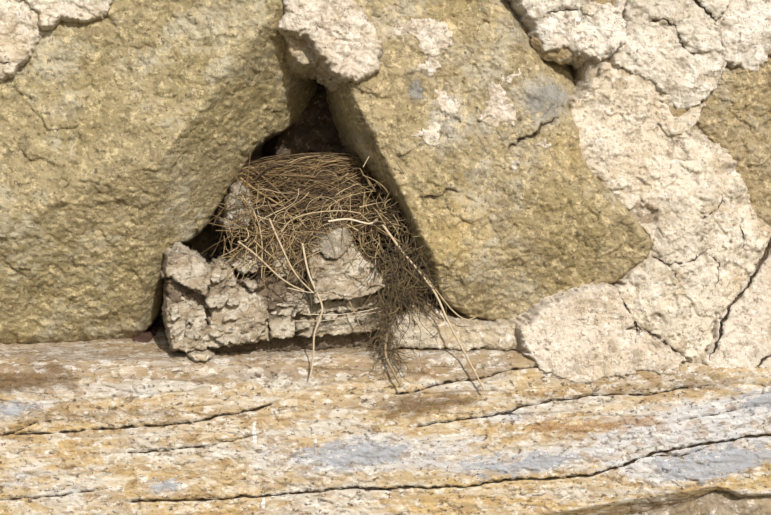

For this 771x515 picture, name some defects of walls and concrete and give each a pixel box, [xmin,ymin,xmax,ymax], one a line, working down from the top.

crack [652,18,698,55]
crack [694,0,723,46]
crack [653,196,745,294]
crack [619,292,677,352]
crack [709,238,771,360]
crack [3,401,280,435]
crack [417,385,707,427]
crack [126,431,771,503]
crack [9,490,97,500]